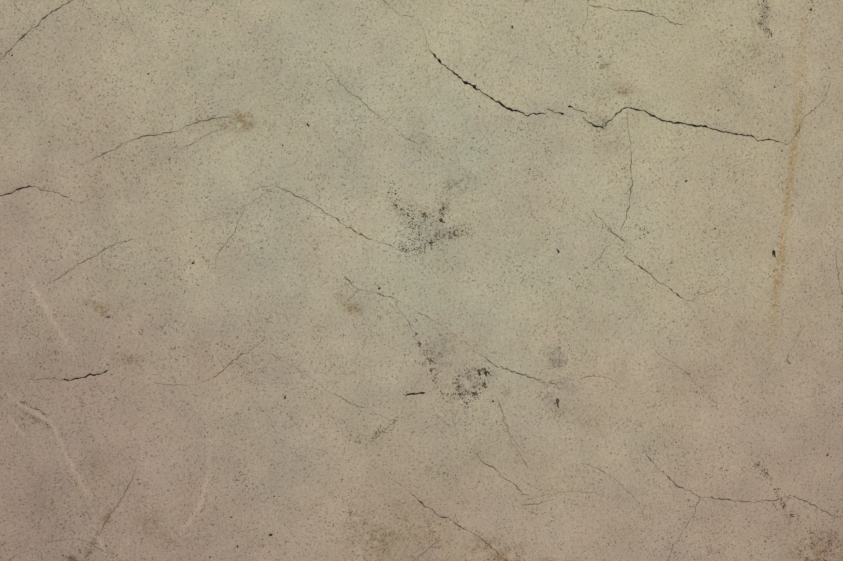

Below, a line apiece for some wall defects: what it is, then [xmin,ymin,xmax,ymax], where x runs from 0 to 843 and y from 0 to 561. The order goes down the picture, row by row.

crack [1,0,72,59]
crack [325,63,419,145]
crack [86,116,232,167]
crack [382,0,830,301]
crack [0,185,70,198]
crack [200,185,412,256]
crack [56,232,169,280]
crack [33,362,133,381]
crack [646,454,839,561]